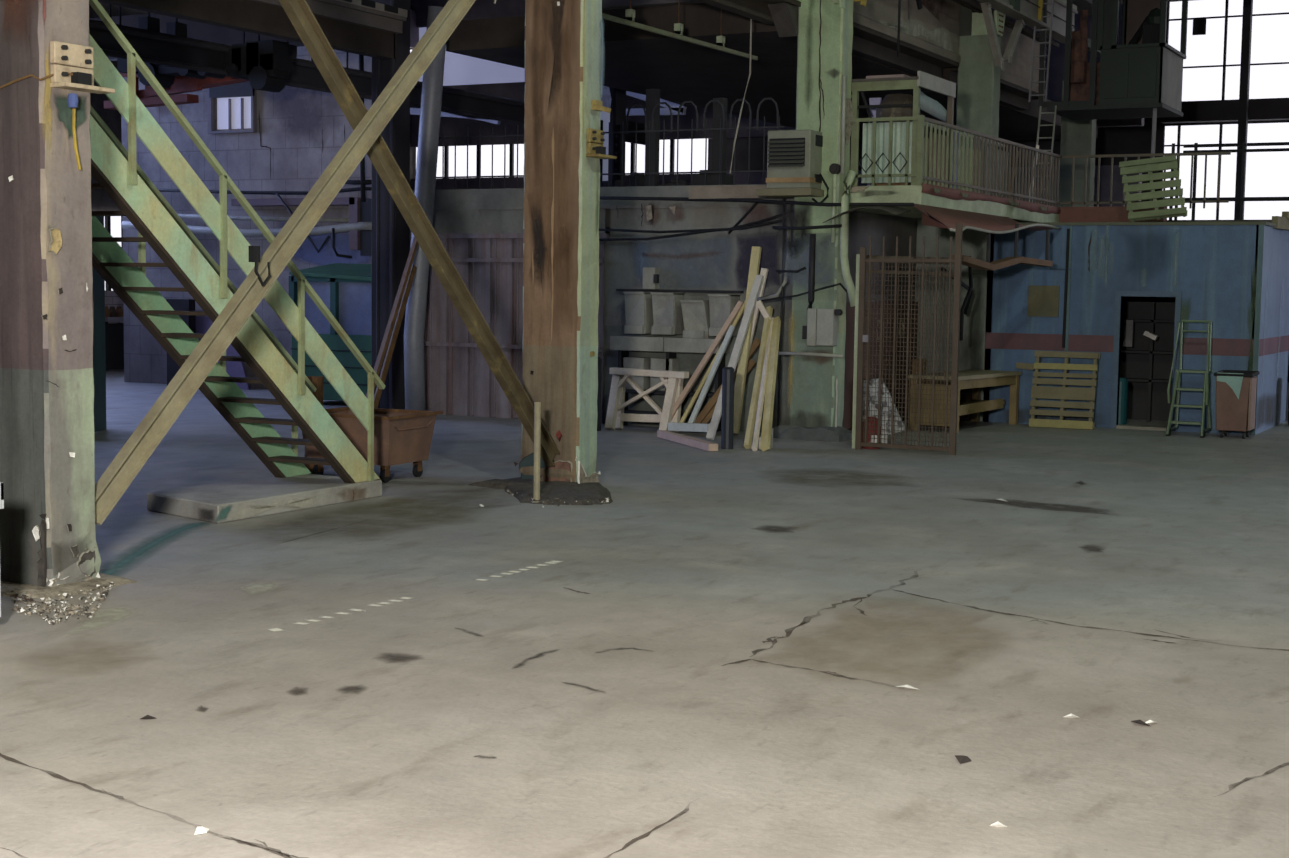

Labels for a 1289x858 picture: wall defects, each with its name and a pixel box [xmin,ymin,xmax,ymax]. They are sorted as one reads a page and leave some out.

spalling [32,514,100,587]
crack [722,583,1096,679]
crack [1130,630,1196,643]
crack [0,753,119,797]
crack [1214,763,1289,797]
crack [225,837,300,858]